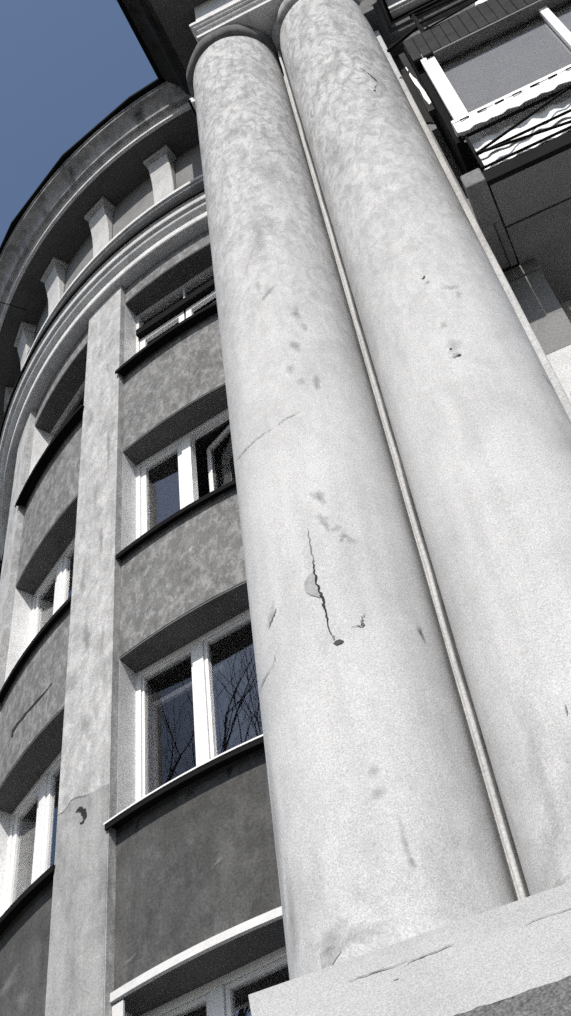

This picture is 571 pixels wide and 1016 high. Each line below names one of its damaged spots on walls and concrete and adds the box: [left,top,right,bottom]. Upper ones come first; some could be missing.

crack [304,528,366,646]